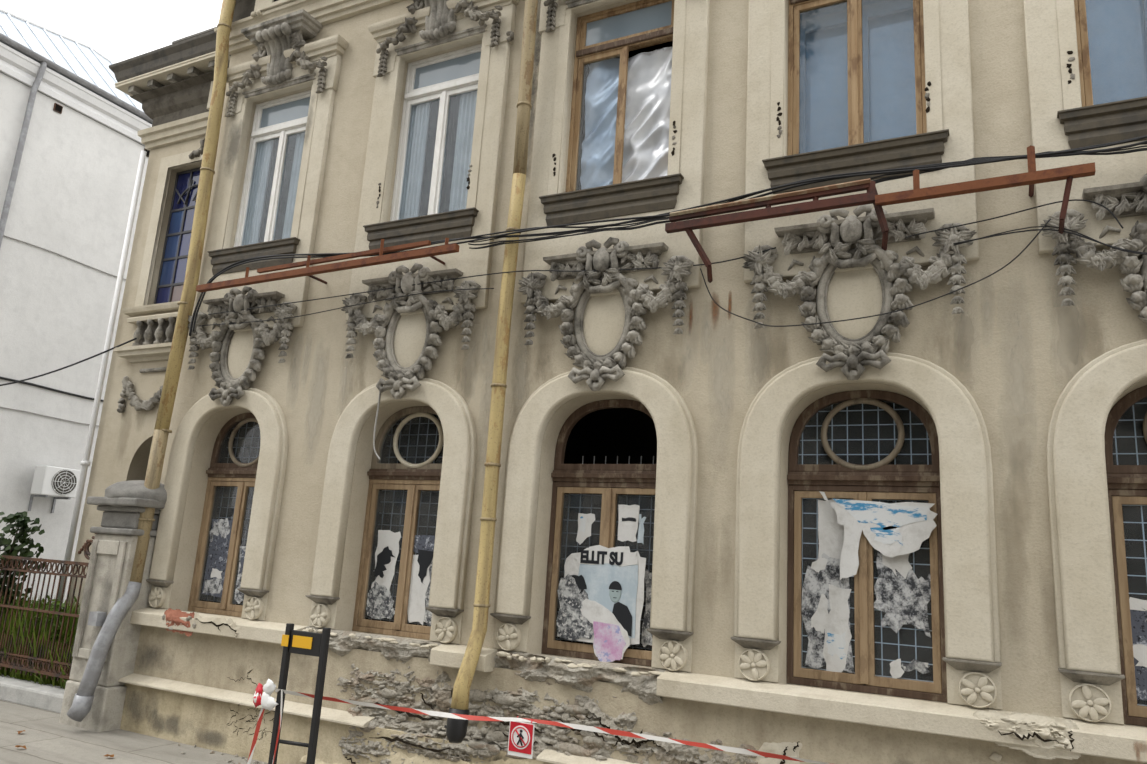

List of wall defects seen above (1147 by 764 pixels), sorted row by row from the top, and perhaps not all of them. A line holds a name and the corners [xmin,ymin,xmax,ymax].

flaking render [162,608,196,637]
crack [194,612,278,740]
spalling [496,651,597,668]
crack [300,755,356,764]
flaking render [335,663,768,764]
spalling [970,710,1081,764]